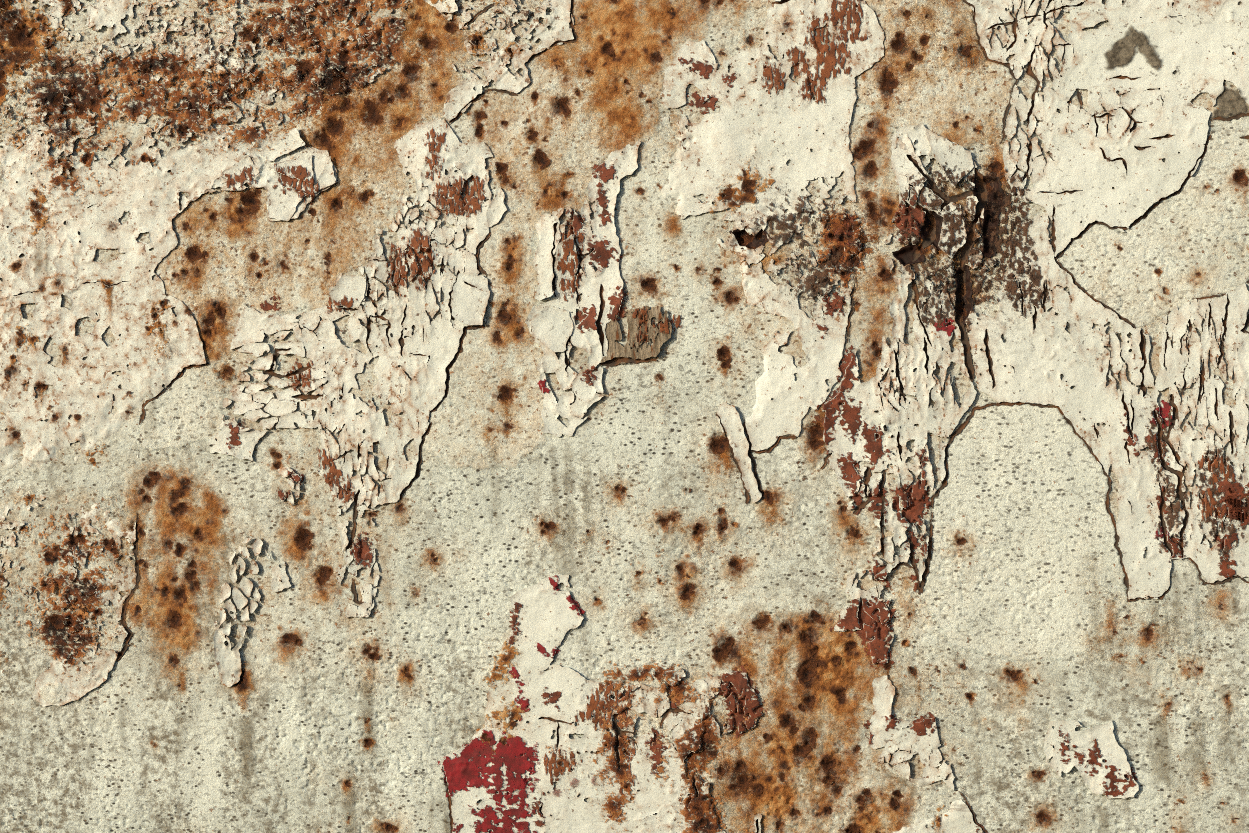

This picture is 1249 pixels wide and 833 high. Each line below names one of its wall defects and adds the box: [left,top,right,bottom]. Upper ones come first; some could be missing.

corrosion [0,0,518,290]
corrosion [467,0,743,213]
peeling [0,0,1249,661]
crack [846,268,857,343]
crack [853,0,1249,602]
crack [715,414,797,504]
corrosion [0,466,228,690]
peeling [213,537,292,687]
peeling [437,574,767,833]
corrosion [544,603,940,833]
crack [958,791,987,833]
peeling [1043,720,1139,799]